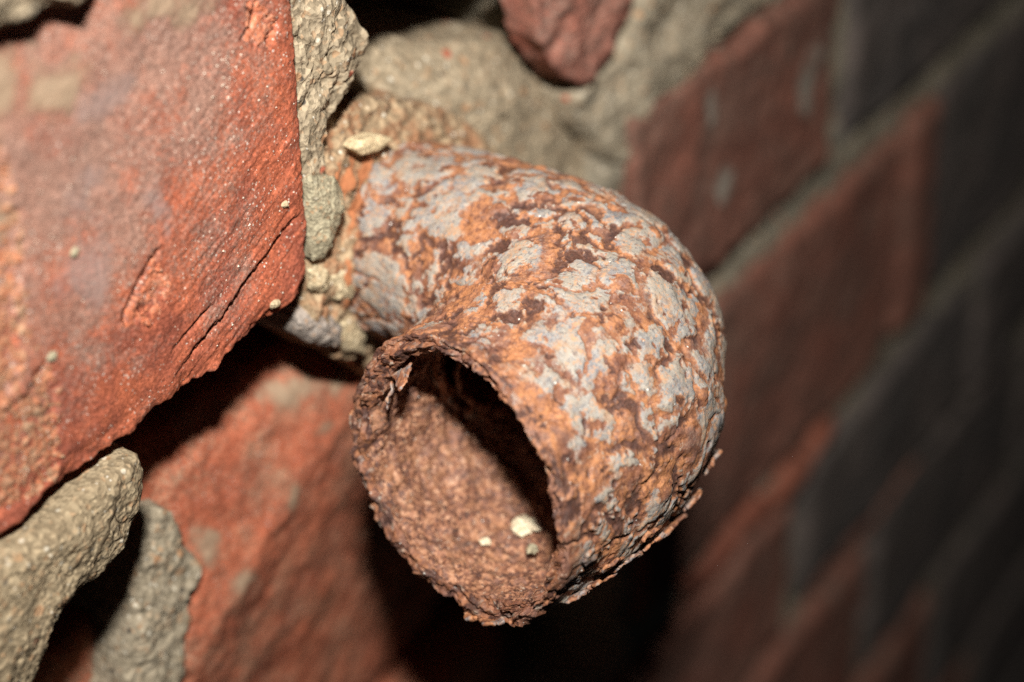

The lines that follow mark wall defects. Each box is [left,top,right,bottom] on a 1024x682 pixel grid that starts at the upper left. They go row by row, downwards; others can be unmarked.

rust [334,153,379,238]
crack [121,244,163,328]
crack [170,208,302,375]
rust [385,355,416,410]
rust [702,449,723,476]
rust [564,488,703,605]
rust [464,611,505,627]